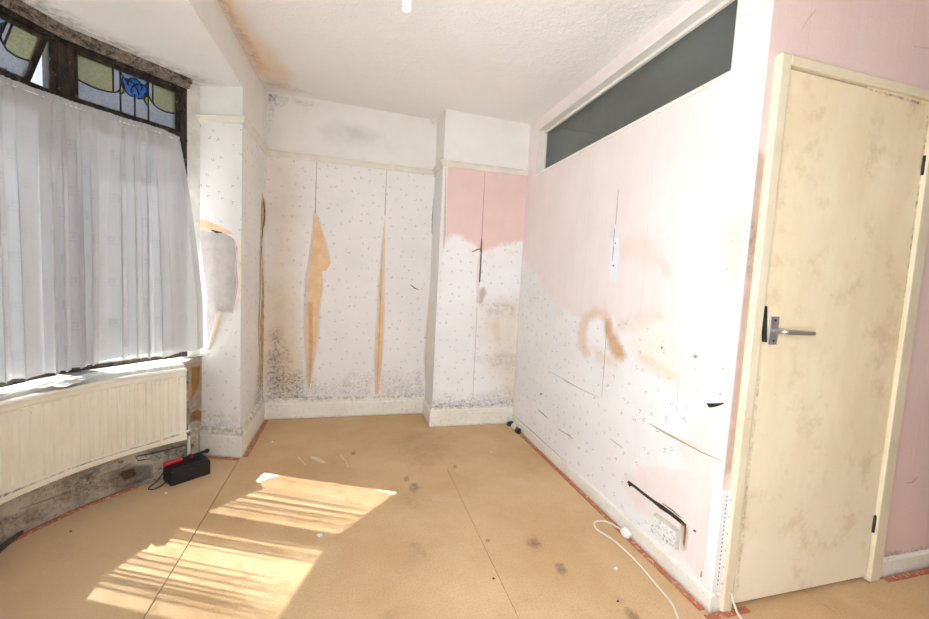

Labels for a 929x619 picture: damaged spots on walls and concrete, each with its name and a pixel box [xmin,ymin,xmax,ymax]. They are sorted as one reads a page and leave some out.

leakage [0,0,521,544]
peeling [433,225,719,582]
leakage [573,137,767,486]